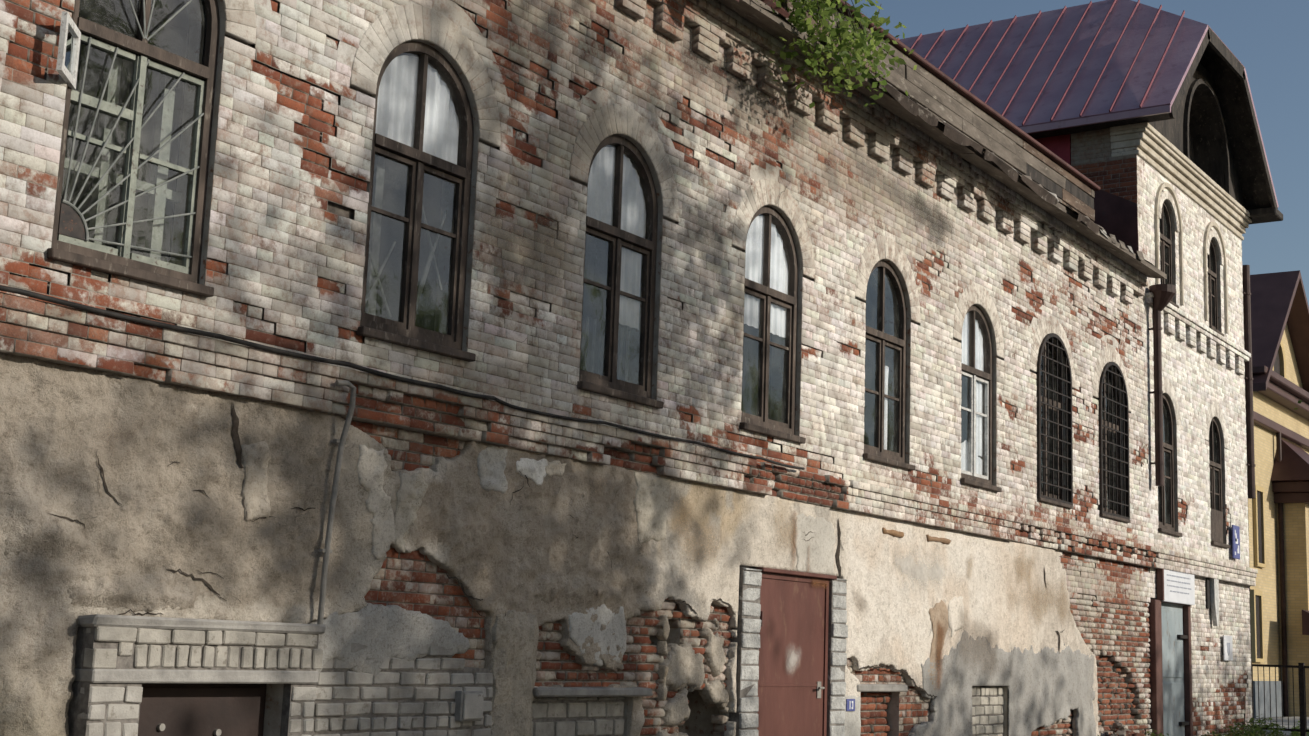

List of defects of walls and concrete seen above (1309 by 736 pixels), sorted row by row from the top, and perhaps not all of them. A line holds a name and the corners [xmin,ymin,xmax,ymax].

crack [48,449,123,529]
crack [165,567,243,605]
crack [232,405,316,522]
spalling [328,383,488,668]
crack [835,519,843,579]
peeling [1013,485,1156,577]
spalling [535,598,733,736]
spalling [847,596,964,736]
spalling [1031,710,1074,736]
spalling [1070,593,1152,736]